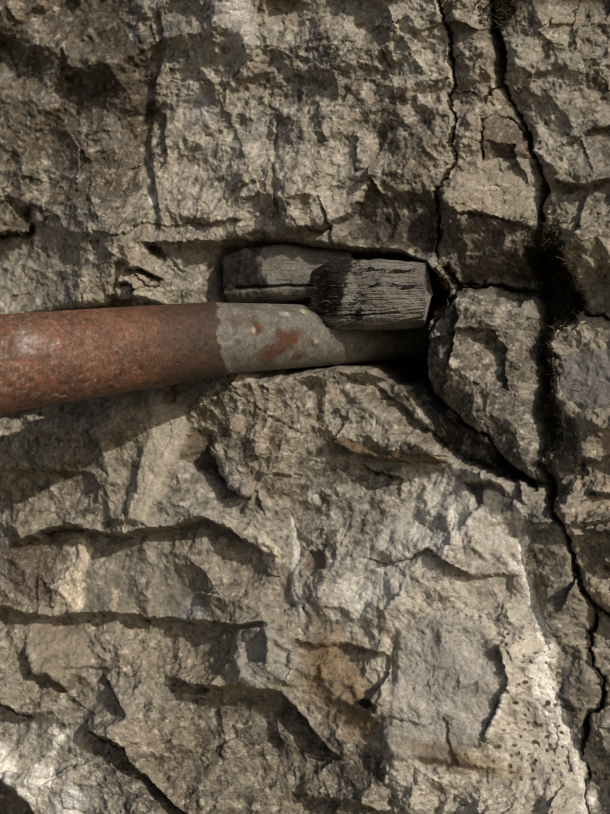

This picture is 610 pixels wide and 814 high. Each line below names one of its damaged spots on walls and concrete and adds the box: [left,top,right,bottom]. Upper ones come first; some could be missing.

crack [572,0,582,44]
crack [433,0,551,299]
crack [576,308,610,321]
crack [428,383,610,800]
crack [0,704,35,719]
crack [87,730,186,814]